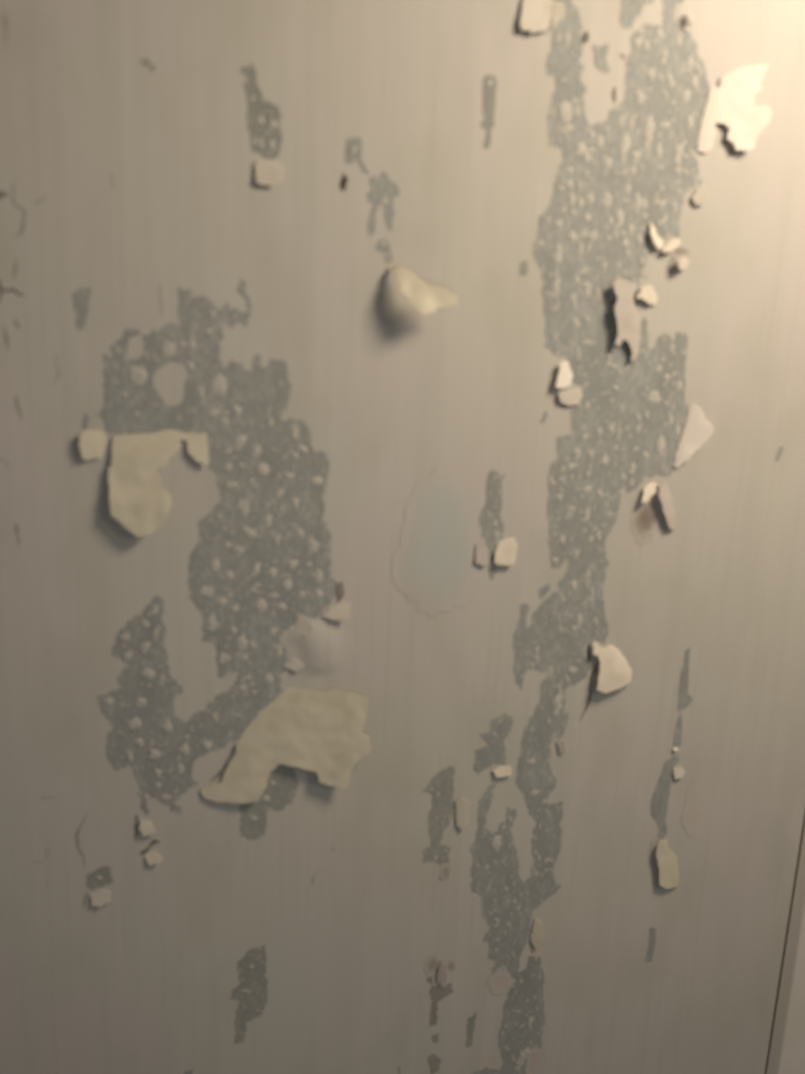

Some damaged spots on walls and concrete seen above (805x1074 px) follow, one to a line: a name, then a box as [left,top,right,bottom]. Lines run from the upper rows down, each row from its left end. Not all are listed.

peeling [240,63,283,186]
peeling [345,137,458,316]
peeling [79,279,372,840]
peeling [423,0,772,1074]
peeling [229,945,268,1044]